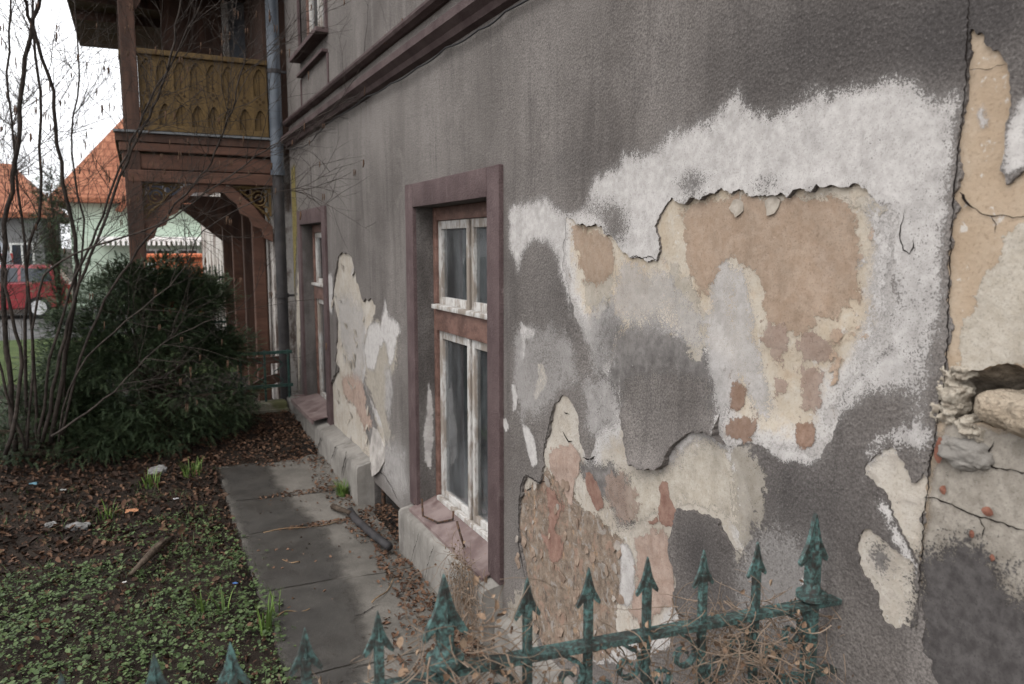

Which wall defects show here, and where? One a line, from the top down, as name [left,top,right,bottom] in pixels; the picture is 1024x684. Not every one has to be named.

peeling [331,253,385,477]
damp [503,384,518,432]
peeling [559,638,670,675]
peeling [515,183,899,645]
damp [508,72,963,606]
peeling [858,421,947,628]
crack [914,0,1024,639]
peeling [945,30,1024,371]